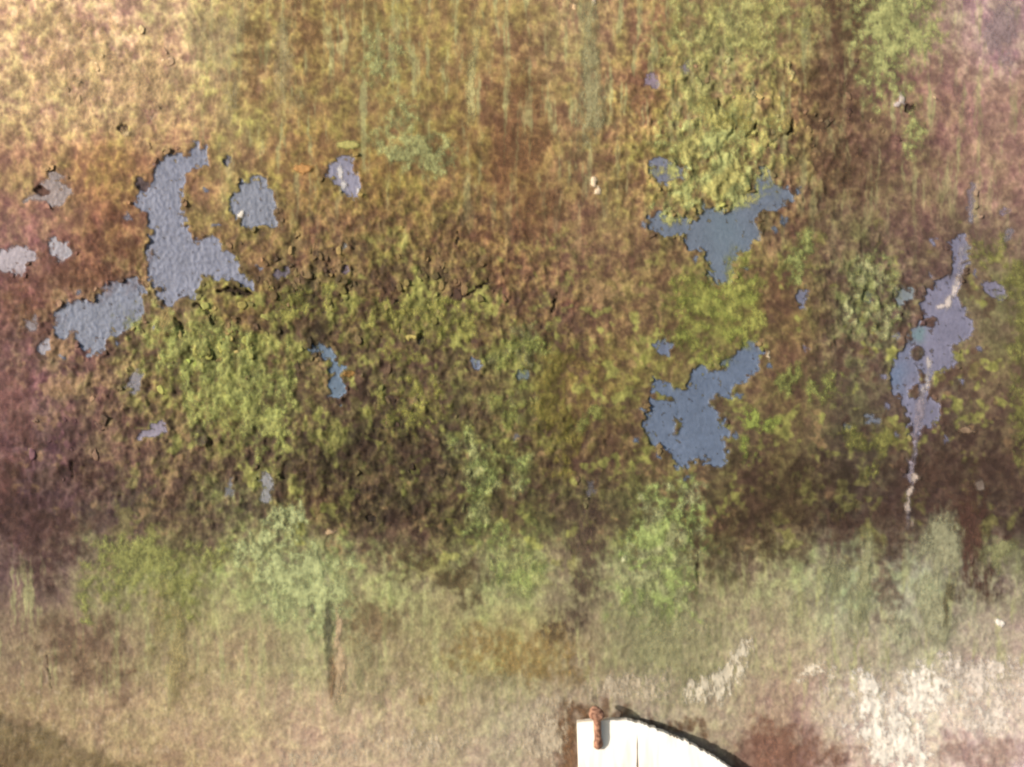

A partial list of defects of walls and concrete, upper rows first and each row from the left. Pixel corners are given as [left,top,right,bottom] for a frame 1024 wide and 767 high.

leakage [2,3,196,136]
peeling [0,245,36,278]
peeling [23,141,364,379]
peeling [295,337,363,406]
peeling [633,339,772,481]
peeling [642,166,800,286]
peeling [881,233,1007,443]
leakage [937,247,964,309]
mould [392,545,480,605]
leakage [570,500,604,597]
leakage [824,358,1024,767]
efflorescence [796,663,836,682]